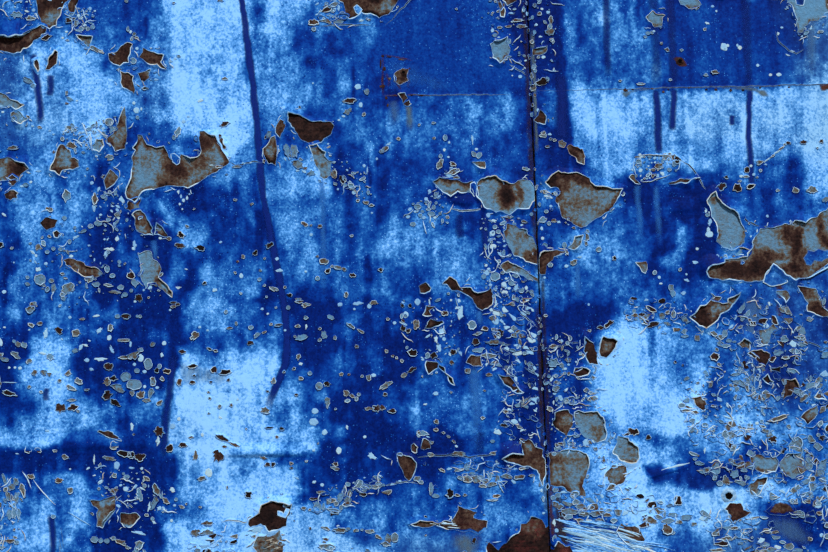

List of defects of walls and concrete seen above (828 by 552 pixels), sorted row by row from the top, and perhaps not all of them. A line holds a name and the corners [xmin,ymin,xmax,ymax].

peeling [0,0,251,414]
spalling [153,417,204,461]
spalling [0,472,36,552]
spalling [54,477,74,495]
peeling [86,429,188,552]